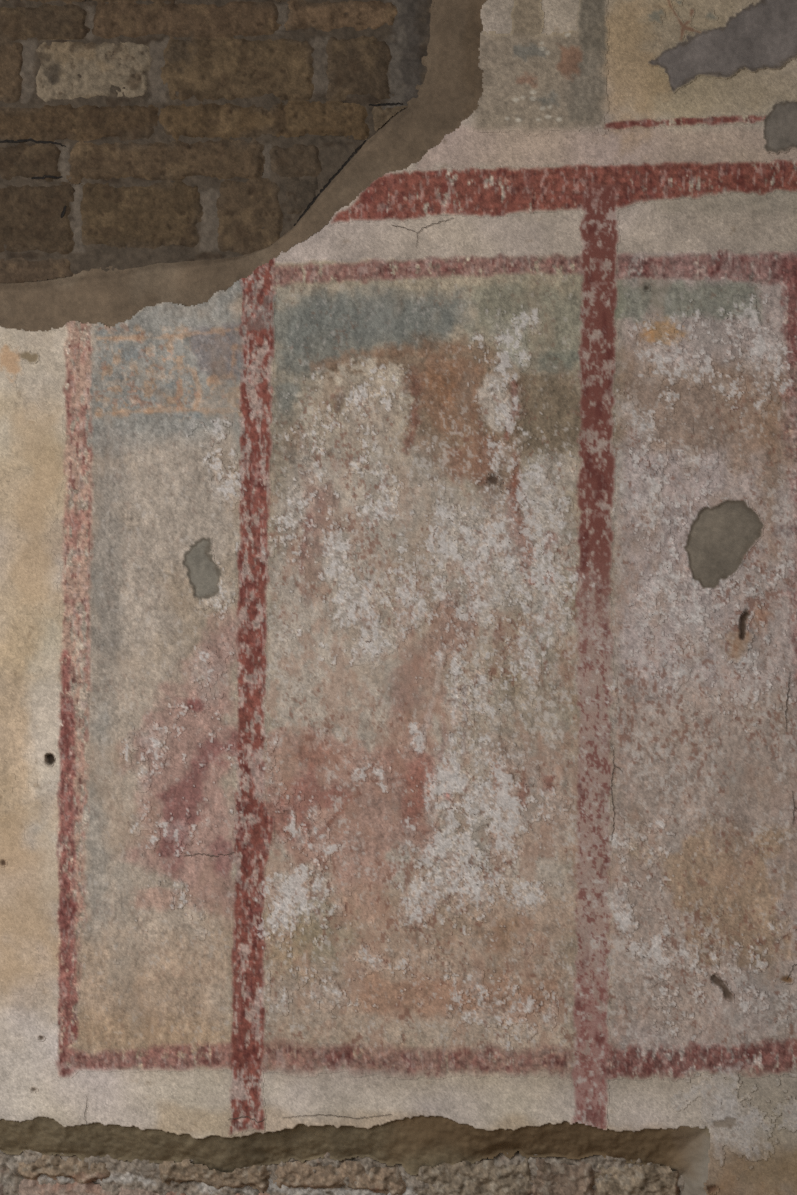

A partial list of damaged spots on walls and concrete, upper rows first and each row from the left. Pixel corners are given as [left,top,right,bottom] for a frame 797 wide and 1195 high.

flaking render [0,0,488,332]
peeling [183,303,602,1051]
peeling [612,293,797,733]
flaking render [0,1114,740,1195]